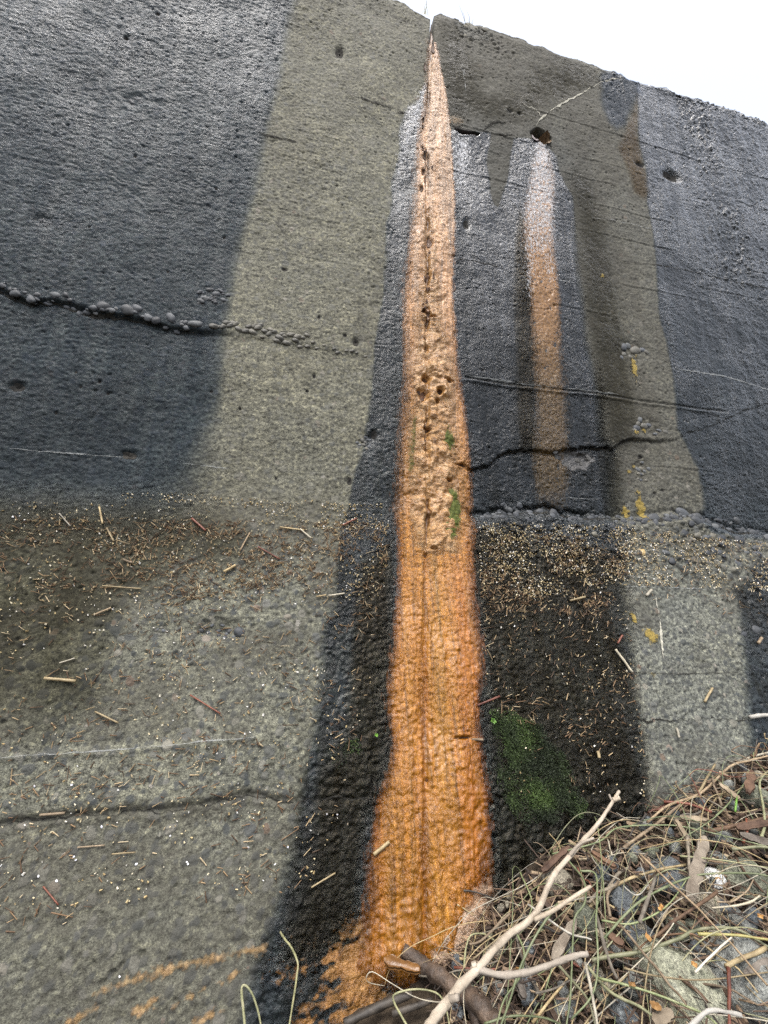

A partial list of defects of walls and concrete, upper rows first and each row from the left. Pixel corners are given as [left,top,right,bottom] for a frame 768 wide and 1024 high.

damp [253,366,410,1024]
corrosion [298,42,490,1024]
damp [390,87,426,221]
crack [423,500,435,558]
crack [417,379,451,450]
crack [361,3,624,351]
corrosion [521,143,565,491]
damp [451,130,644,937]
crack [447,403,767,482]
damp [637,82,768,538]